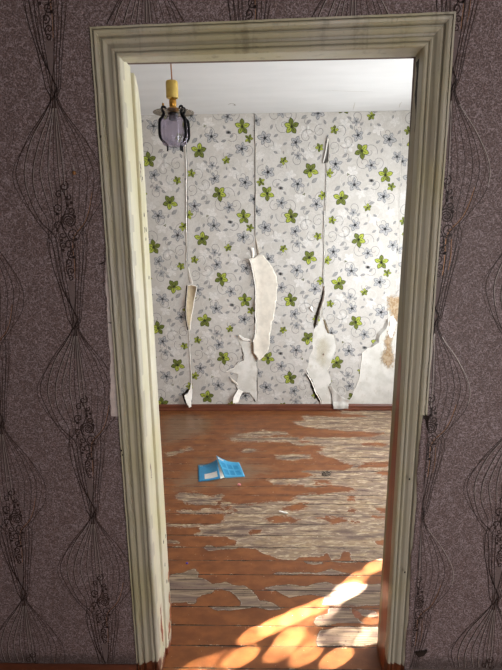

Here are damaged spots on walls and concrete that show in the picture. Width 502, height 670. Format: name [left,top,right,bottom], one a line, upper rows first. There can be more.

peeling [227,237,278,401]
flaking render [307,295,336,404]
flaking render [349,296,399,404]
peeling [160,568,281,645]
peeling [264,561,381,647]